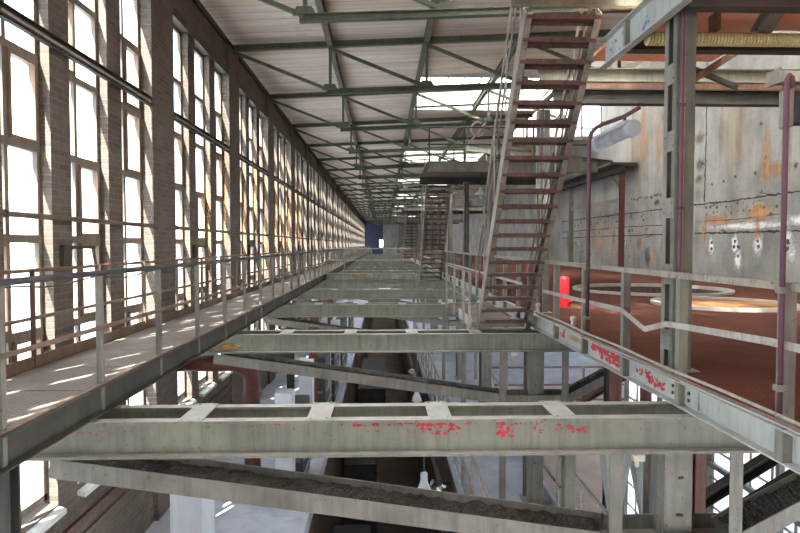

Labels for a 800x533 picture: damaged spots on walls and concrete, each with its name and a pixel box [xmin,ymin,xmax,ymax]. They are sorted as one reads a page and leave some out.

crack [694,107,800,234]